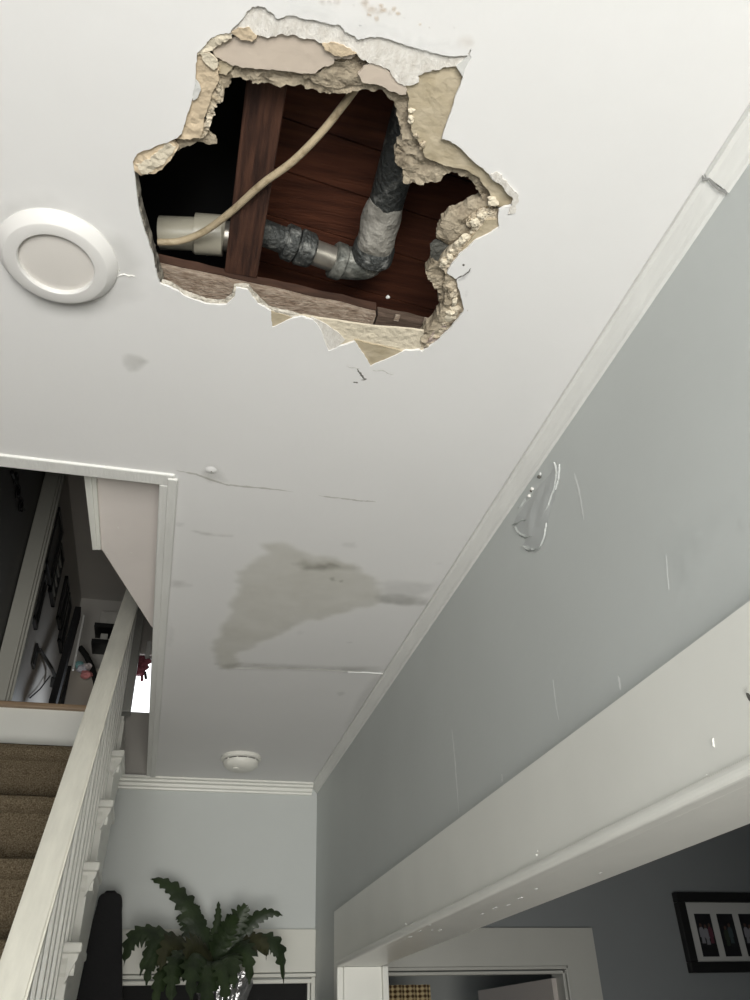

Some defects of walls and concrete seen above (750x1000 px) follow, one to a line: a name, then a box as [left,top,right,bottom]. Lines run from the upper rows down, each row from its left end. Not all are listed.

spalling [197,33,232,55]
spalling [199,60,234,139]
peeling [358,63,407,95]
peeling [490,172,519,214]
spalling [135,172,299,326]
spalling [420,239,468,347]
peeling [354,339,403,366]
crack [177,470,291,492]
peeling [512,461,560,552]